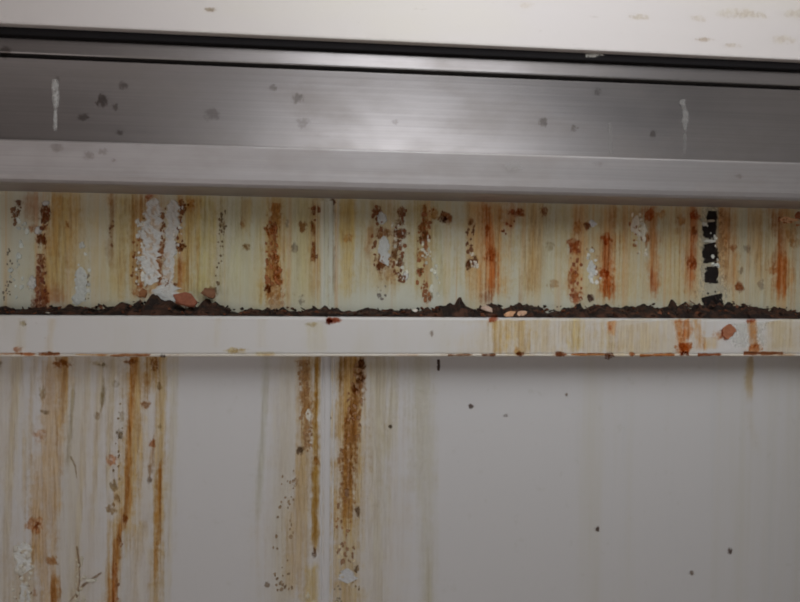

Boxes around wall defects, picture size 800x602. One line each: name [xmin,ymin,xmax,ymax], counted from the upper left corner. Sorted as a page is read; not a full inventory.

rust [27,254,49,308]
rust [35,201,50,245]
rust [176,199,189,252]
rust [201,210,227,299]
rust [264,221,283,293]
rust [371,205,451,303]
rust [465,222,479,270]
rust [569,241,583,301]
rust [701,208,724,306]
rust [297,408,313,453]
rust [340,359,366,451]
rust [334,469,360,602]